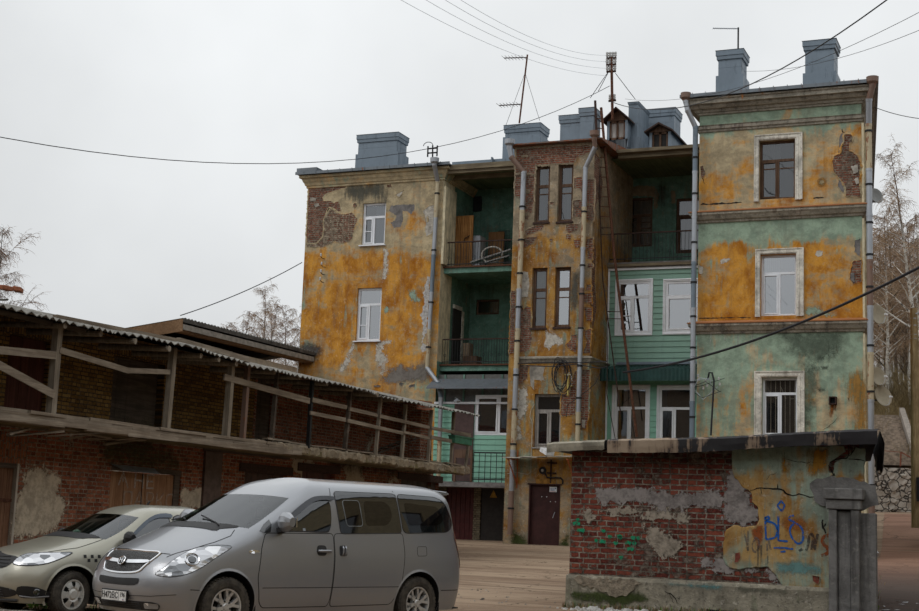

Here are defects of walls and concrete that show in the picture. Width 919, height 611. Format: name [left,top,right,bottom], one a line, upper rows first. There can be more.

flaking render [830,132,863,199]
flaking render [305,186,358,248]
flaking render [513,144,603,355]
flaking render [508,271,534,355]
flaking render [518,364,546,390]
flaking render [593,464,758,527]
crack [750,445,864,498]
flaking render [700,552,781,585]